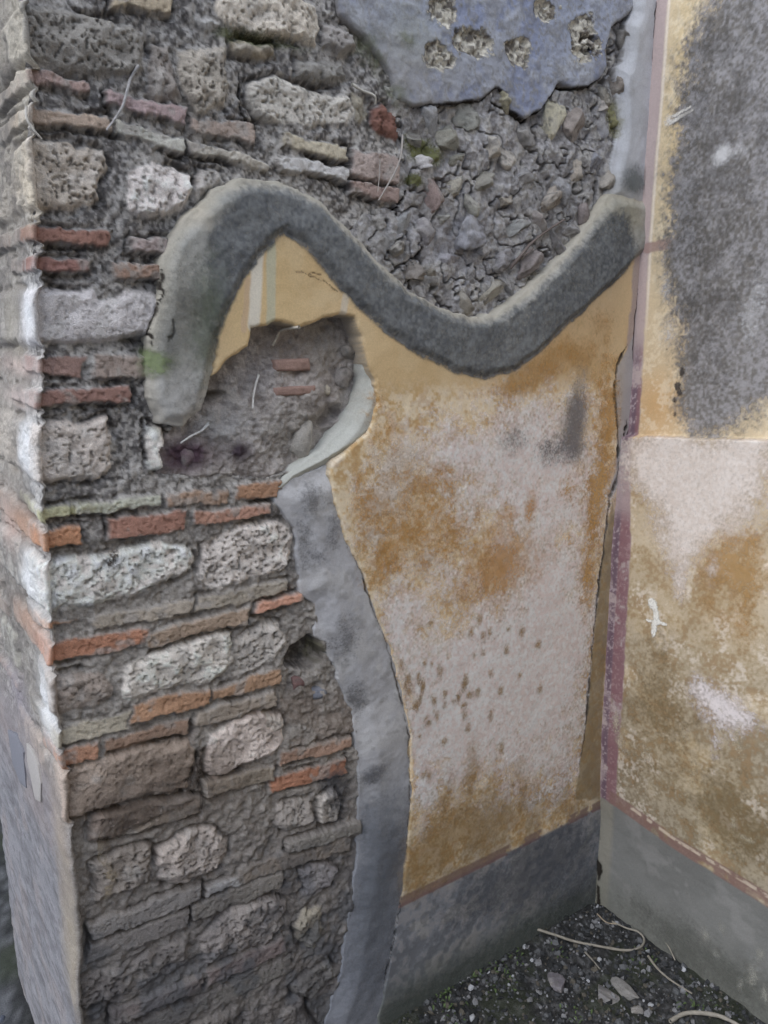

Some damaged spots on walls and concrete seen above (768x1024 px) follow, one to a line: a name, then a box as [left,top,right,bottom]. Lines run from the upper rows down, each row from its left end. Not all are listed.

spalling [156,317,355,479]
water stain [201,189,636,832]
spalling [422,0,533,73]
spalling [349,12,631,317]
spalling [533,0,562,23]
crack [577,303,637,772]
water stain [618,0,768,598]
water stain [689,675,756,744]